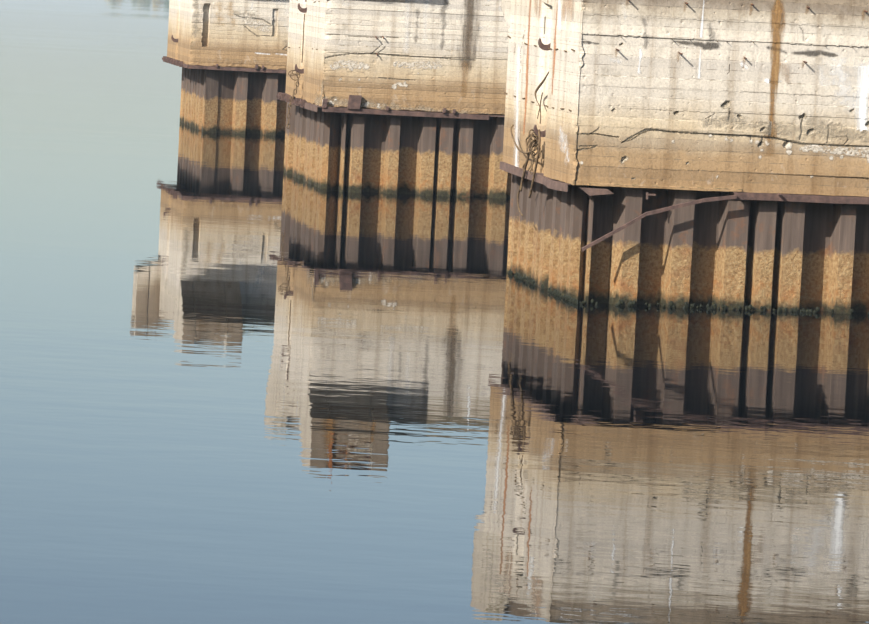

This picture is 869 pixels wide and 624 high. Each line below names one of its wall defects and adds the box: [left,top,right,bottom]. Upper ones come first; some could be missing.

crack [574,109,869,152]
rust [766,0,785,139]
peeling [783,128,869,163]
damp [857,65,869,131]